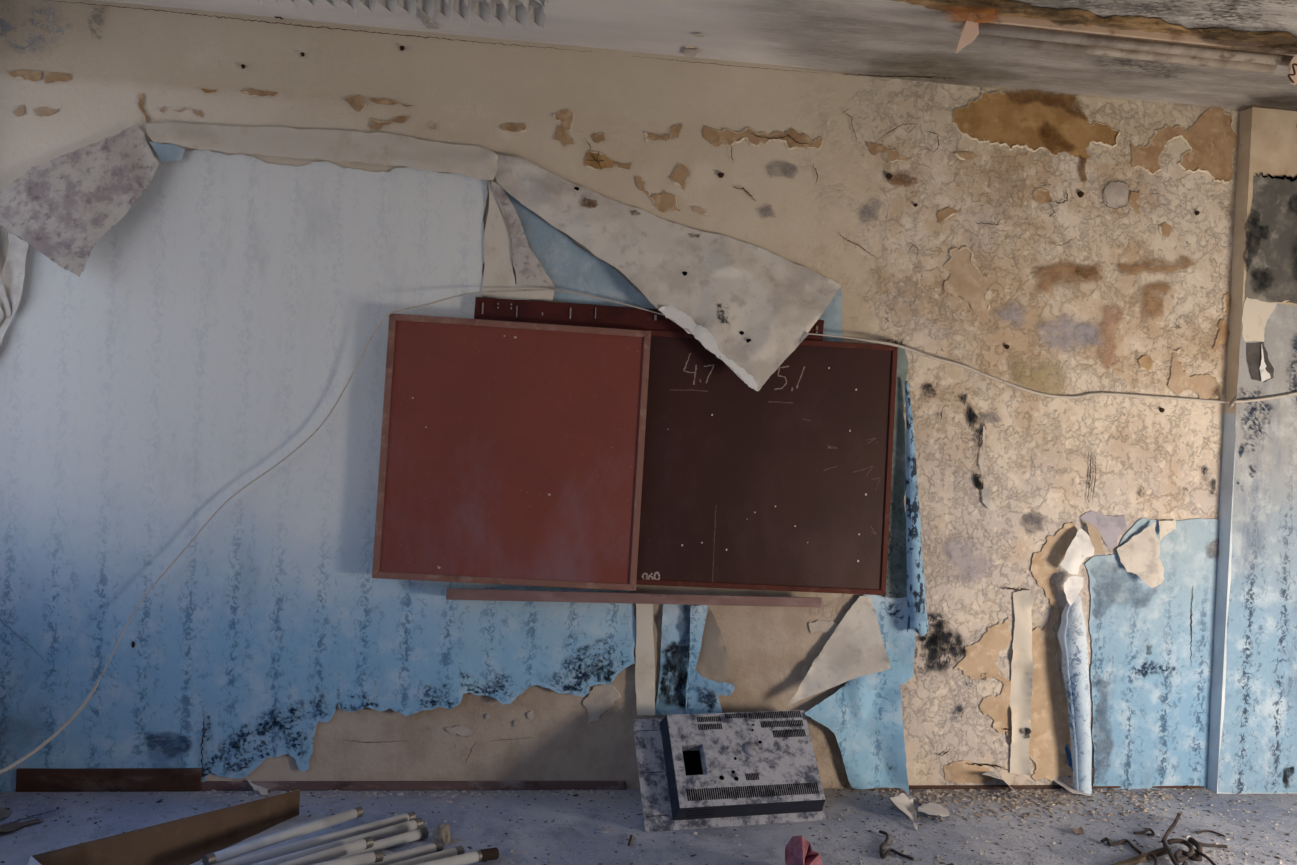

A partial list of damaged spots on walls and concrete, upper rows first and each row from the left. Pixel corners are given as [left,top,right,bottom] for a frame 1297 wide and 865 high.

leakage [774,0,1297,119]
peeling [891,0,1297,49]
peeling [553,109,575,146]
peeling [584,132,708,217]
crack [1039,184,1076,246]
peeling [952,88,1239,183]
crack [1087,452,1096,503]
mould [1238,392,1273,490]
mould [915,614,966,673]
peeling [1029,522,1091,796]
leakage [145,689,379,777]
leakage [1283,767,1294,788]